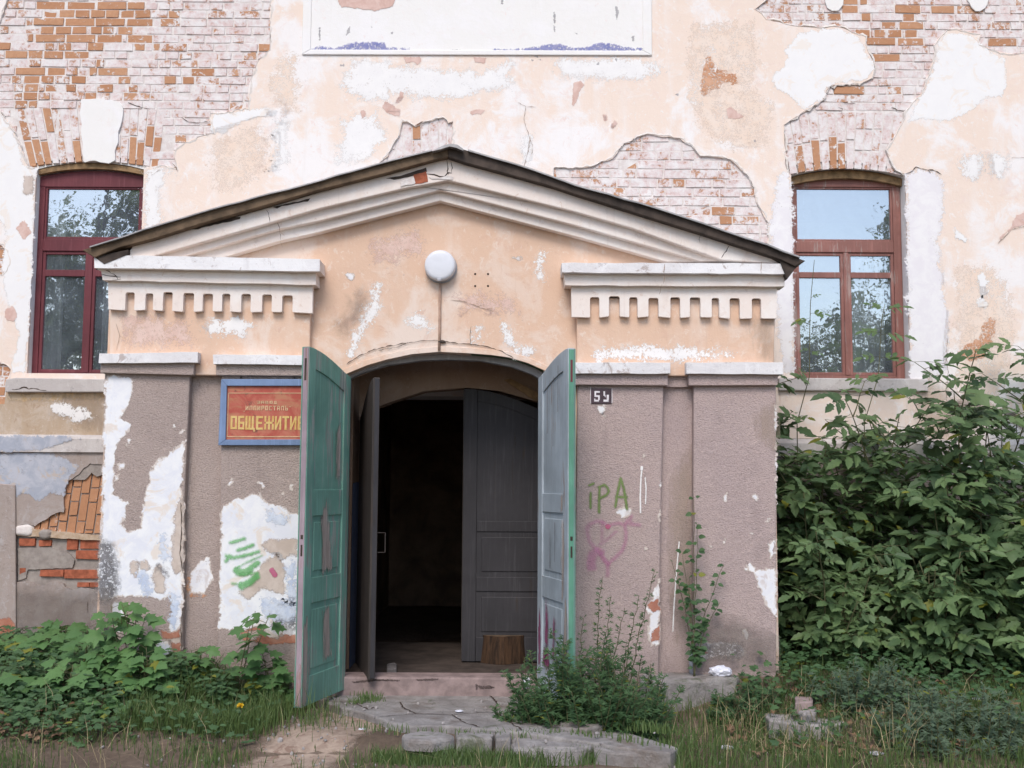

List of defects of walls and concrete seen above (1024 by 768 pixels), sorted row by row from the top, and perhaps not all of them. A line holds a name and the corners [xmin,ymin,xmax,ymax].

peeling [333,56,516,165]
spalling [0,0,306,404]
spalling [550,0,1024,430]
peeling [346,283,388,365]
peeling [0,374,298,658]
spalling [646,577,661,647]
peeling [744,539,778,617]